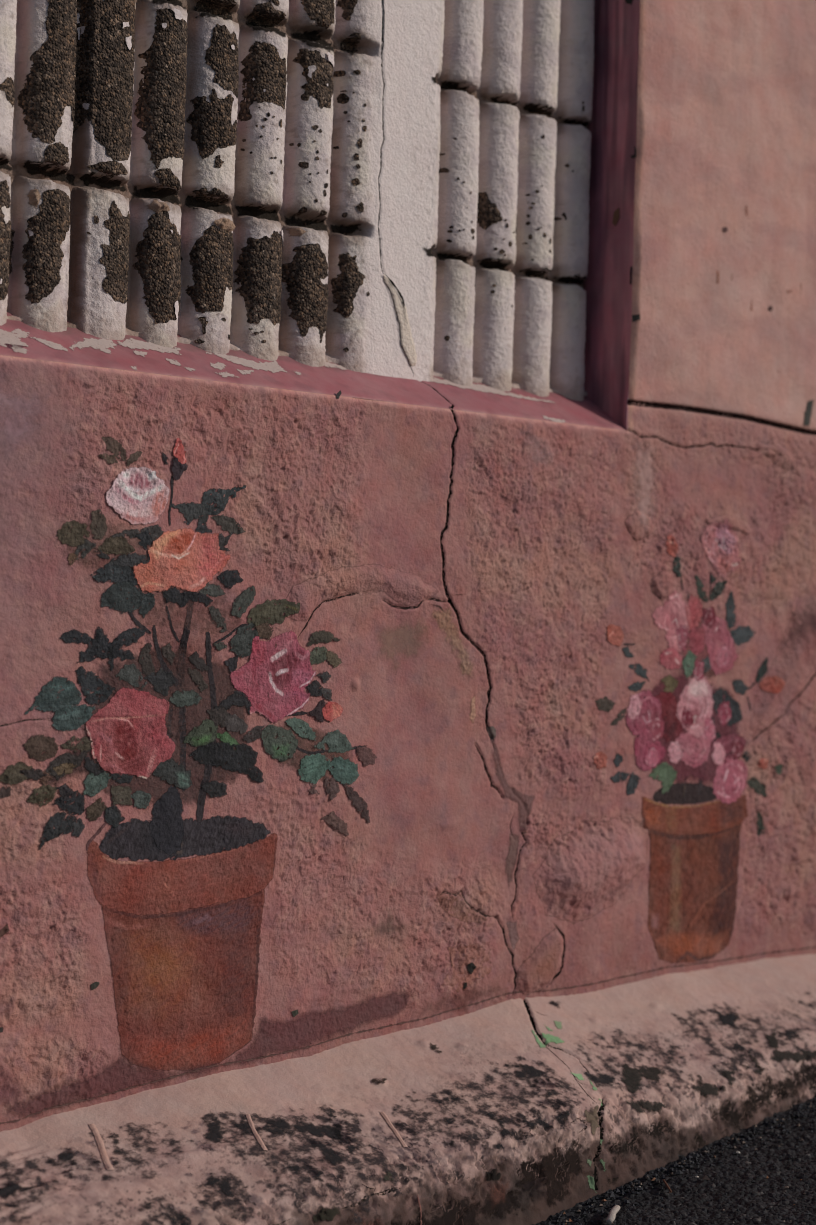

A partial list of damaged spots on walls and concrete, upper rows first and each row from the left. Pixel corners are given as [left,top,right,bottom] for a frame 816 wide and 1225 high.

peeling [0,0,367,217]
peeling [0,180,70,304]
peeling [0,329,195,371]
peeling [87,200,370,378]
crack [378,0,502,798]
peeling [432,377,566,423]
crack [629,430,758,452]
crack [298,593,359,637]
damp [578,992,816,1098]
damp [0,1056,577,1225]